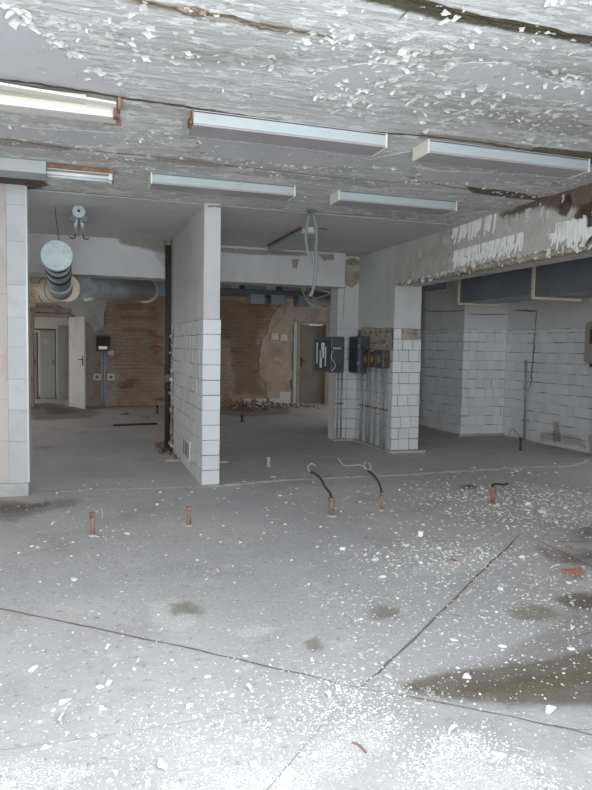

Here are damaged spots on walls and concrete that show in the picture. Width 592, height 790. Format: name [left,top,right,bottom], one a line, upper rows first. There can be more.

peeling [0,0,236,94]
crack [133,0,333,38]
peeling [192,5,592,148]
crack [366,0,592,44]
peeling [0,112,442,194]
crack [0,138,549,200]
spalling [394,168,592,288]
damp [501,183,592,244]
spalling [242,392,290,404]
damp [561,595,592,607]
crack [0,533,592,750]
damp [411,651,592,701]